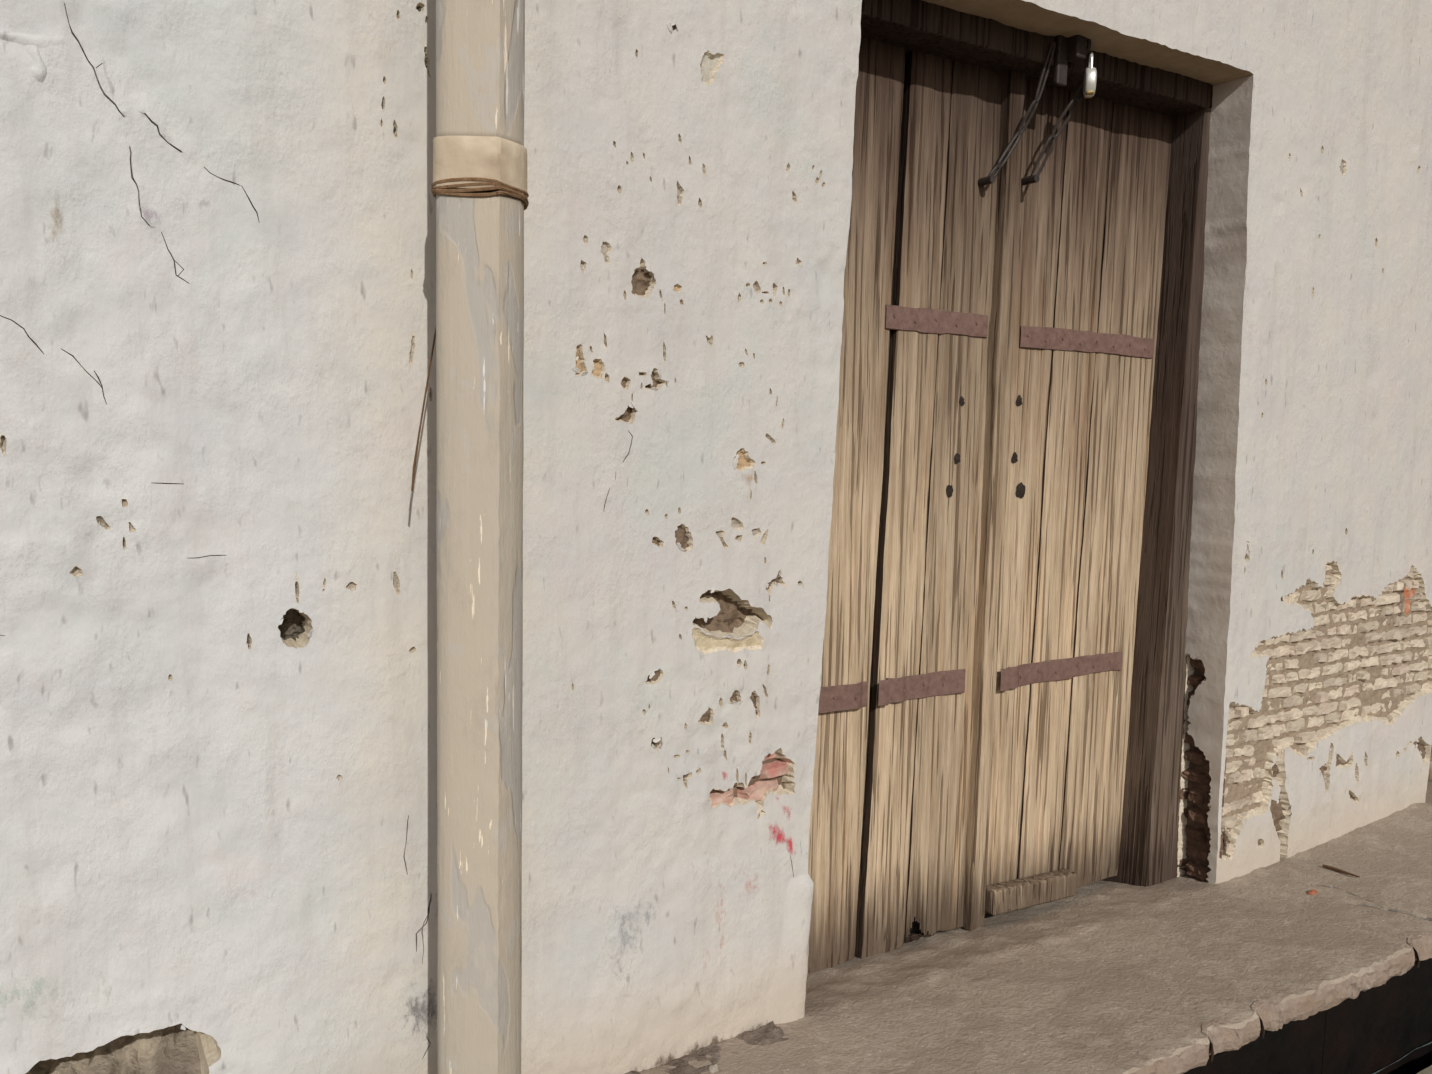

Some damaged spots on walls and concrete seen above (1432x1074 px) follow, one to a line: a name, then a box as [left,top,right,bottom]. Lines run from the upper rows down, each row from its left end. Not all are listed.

crack [65,5,260,284]
crack [0,315,107,404]
peeling [278,573,304,625]
flaking render [672,516,802,819]
flaking render [1177,549,1432,883]
spalling [651,737,701,789]
spalling [25,1023,221,1074]